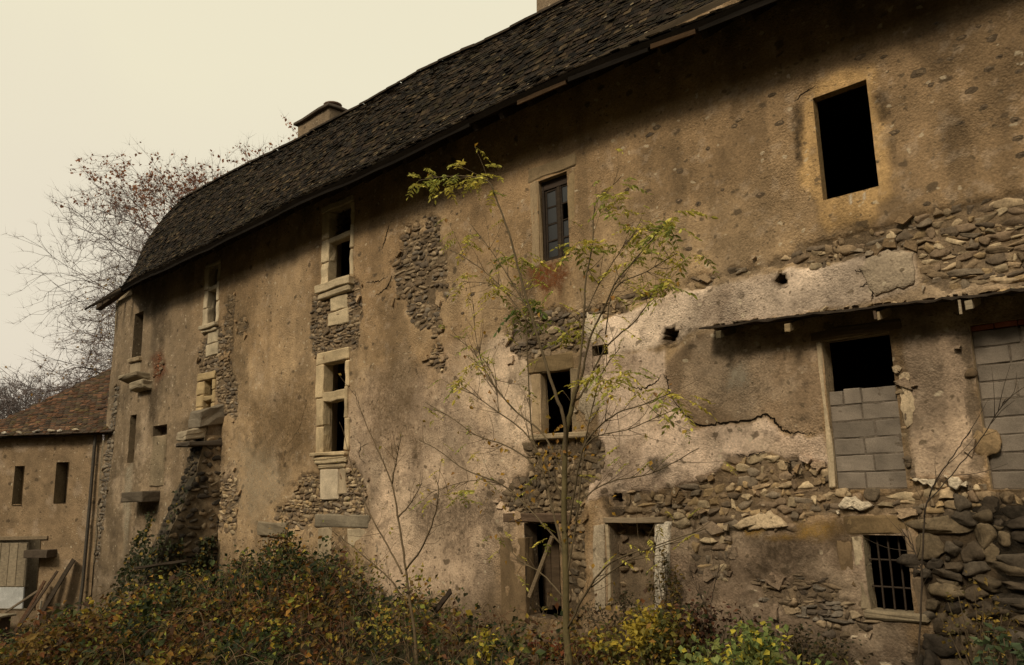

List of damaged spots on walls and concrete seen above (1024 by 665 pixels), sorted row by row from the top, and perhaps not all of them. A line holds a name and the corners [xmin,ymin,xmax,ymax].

flaking render [194,292,249,423]
flaking render [390,214,456,373]
crack [632,374,813,435]
flaking render [500,192,1024,365]
flaking render [218,468,242,536]
flaking render [274,460,371,533]
flaking render [493,361,606,623]
flaking render [608,325,1024,665]